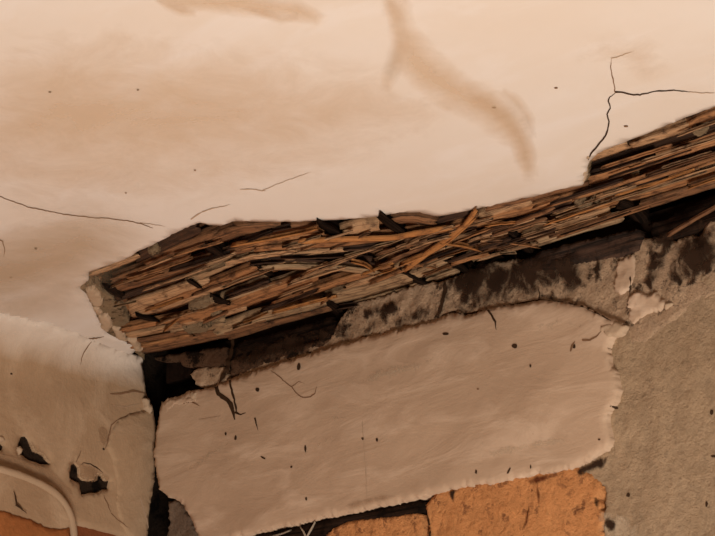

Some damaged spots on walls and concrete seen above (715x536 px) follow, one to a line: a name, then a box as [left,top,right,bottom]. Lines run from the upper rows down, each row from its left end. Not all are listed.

crack [588,52,711,160]
crack [0,196,164,228]
spalling [80,274,145,360]
water stain [364,303,402,334]
water stain [440,253,585,308]
flaking render [600,254,673,338]
water stain [643,219,715,290]
crack [183,339,258,429]
crack [273,372,317,398]
spalling [16,437,48,465]
crack [105,413,139,449]
spalling [69,464,108,494]